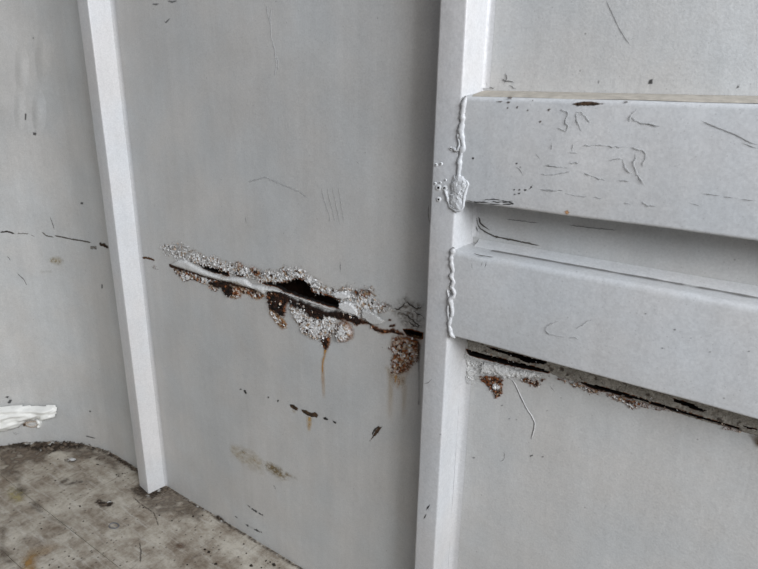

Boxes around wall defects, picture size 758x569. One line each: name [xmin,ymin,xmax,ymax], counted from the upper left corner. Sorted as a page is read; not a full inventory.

corrosion [169,264,360,328]
peeling [161,243,390,340]
corrosion [320,337,330,373]
corrosion [388,335,420,382]
crack [512,380,536,439]